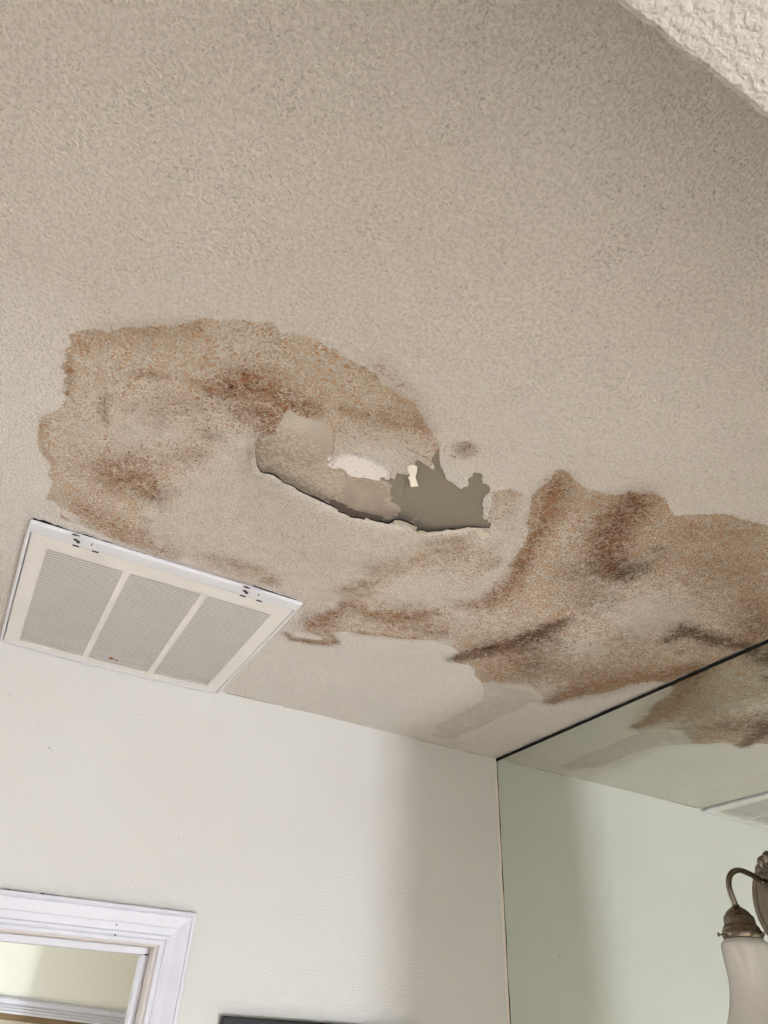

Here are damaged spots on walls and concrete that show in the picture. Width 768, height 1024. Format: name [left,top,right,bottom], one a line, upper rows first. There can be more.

water stain [38,318,439,558]
peeling [251,409,491,540]
water stain [284,470,768,704]